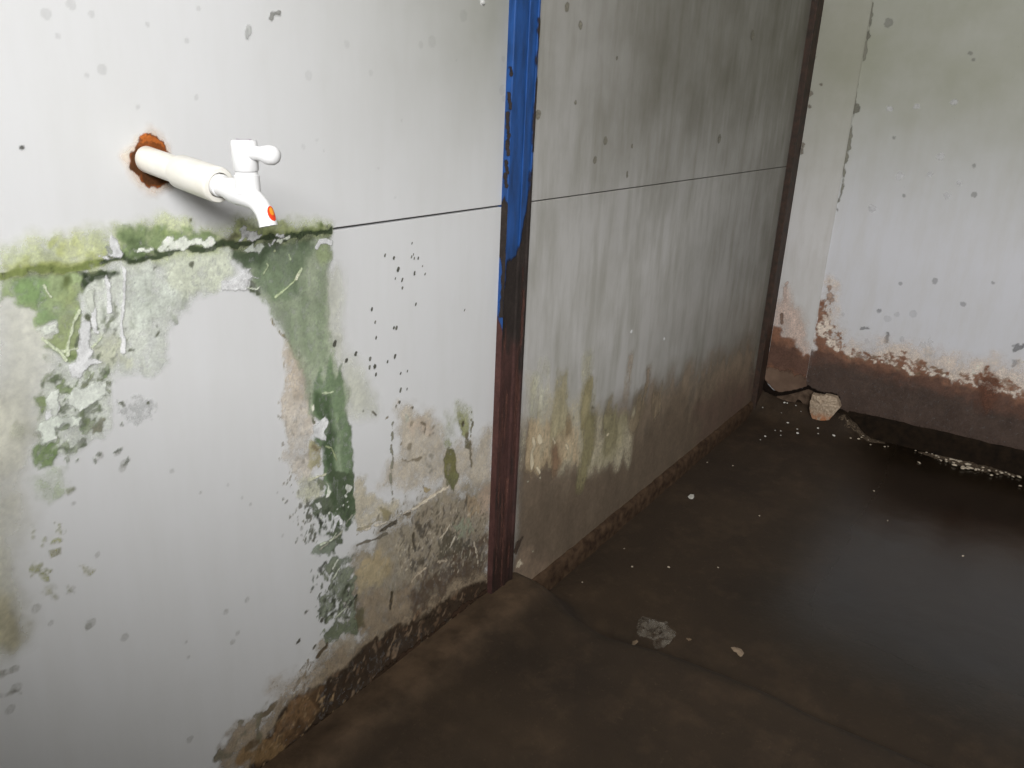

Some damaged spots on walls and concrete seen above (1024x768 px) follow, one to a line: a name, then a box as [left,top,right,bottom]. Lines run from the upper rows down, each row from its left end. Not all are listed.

corrosion [129,133,169,188]
peeling [37,225,290,454]
peeling [312,405,328,441]
peeling [316,483,352,532]
damp [272,319,492,733]
corrosion [487,53,538,594]
damp [531,356,662,489]
corrosion [767,278,1024,450]